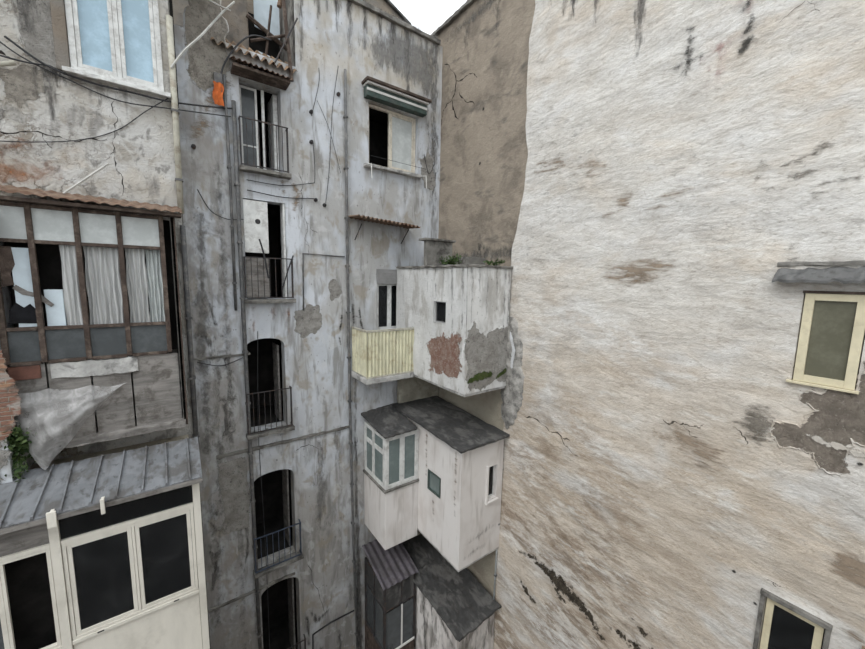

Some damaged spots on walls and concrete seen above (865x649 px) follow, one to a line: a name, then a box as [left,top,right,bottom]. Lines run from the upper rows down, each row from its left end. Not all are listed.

leakage [738,17,753,53]
crack [441,64,477,125]
spalling [293,304,323,338]
spalling [328,279,342,301]
spalling [426,321,508,391]
flaking render [0,350,22,447]
spalling [769,361,865,476]
crack [519,551,653,649]